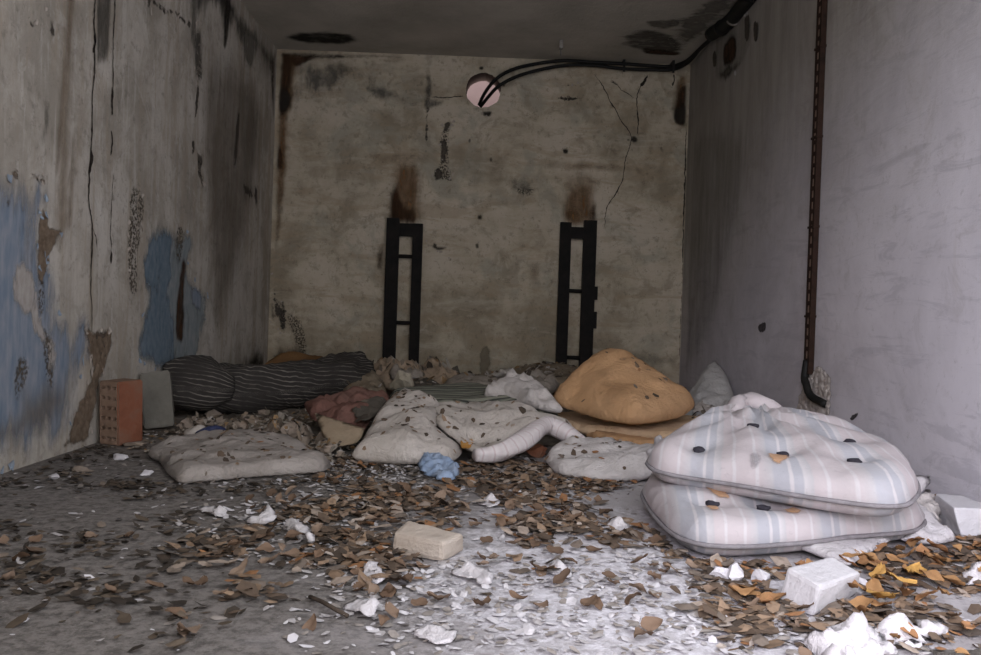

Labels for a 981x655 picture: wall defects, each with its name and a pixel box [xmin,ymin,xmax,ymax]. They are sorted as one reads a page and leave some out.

water stain [97,0,110,60]
water stain [192,0,271,69]
crack [596,75,648,227]
rust [392,166,417,222]
rust [566,186,595,222]
peeling [0,168,112,447]
peeling [127,189,208,371]